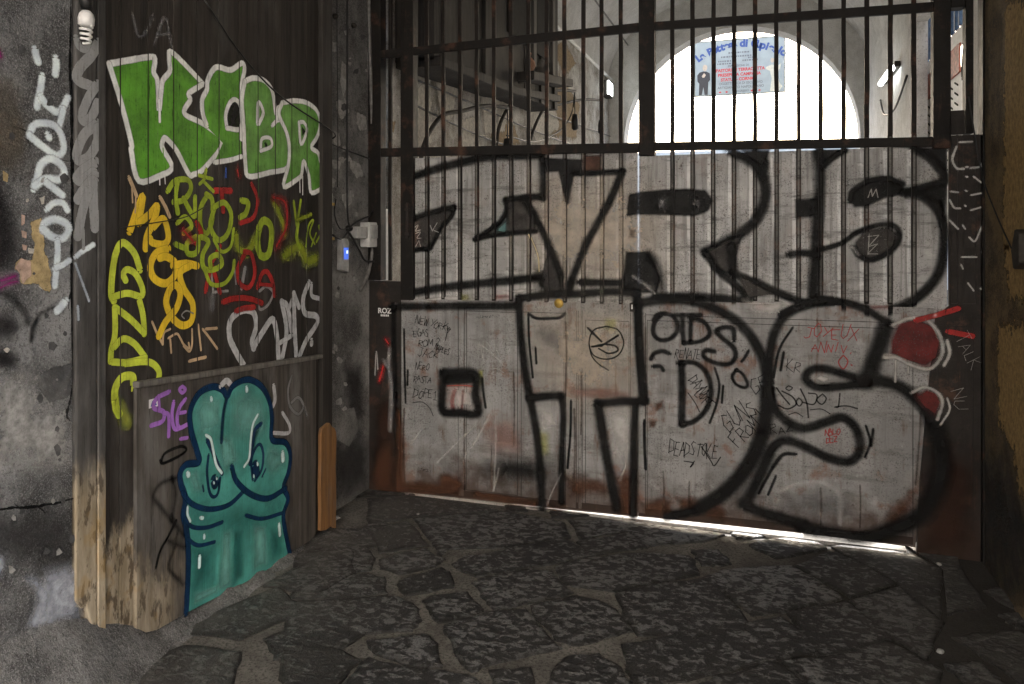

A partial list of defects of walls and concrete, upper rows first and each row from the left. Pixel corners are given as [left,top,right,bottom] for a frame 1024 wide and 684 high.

crack [0,498,74,513]
corrosion [396,410,562,511]
corrosion [565,323,693,515]